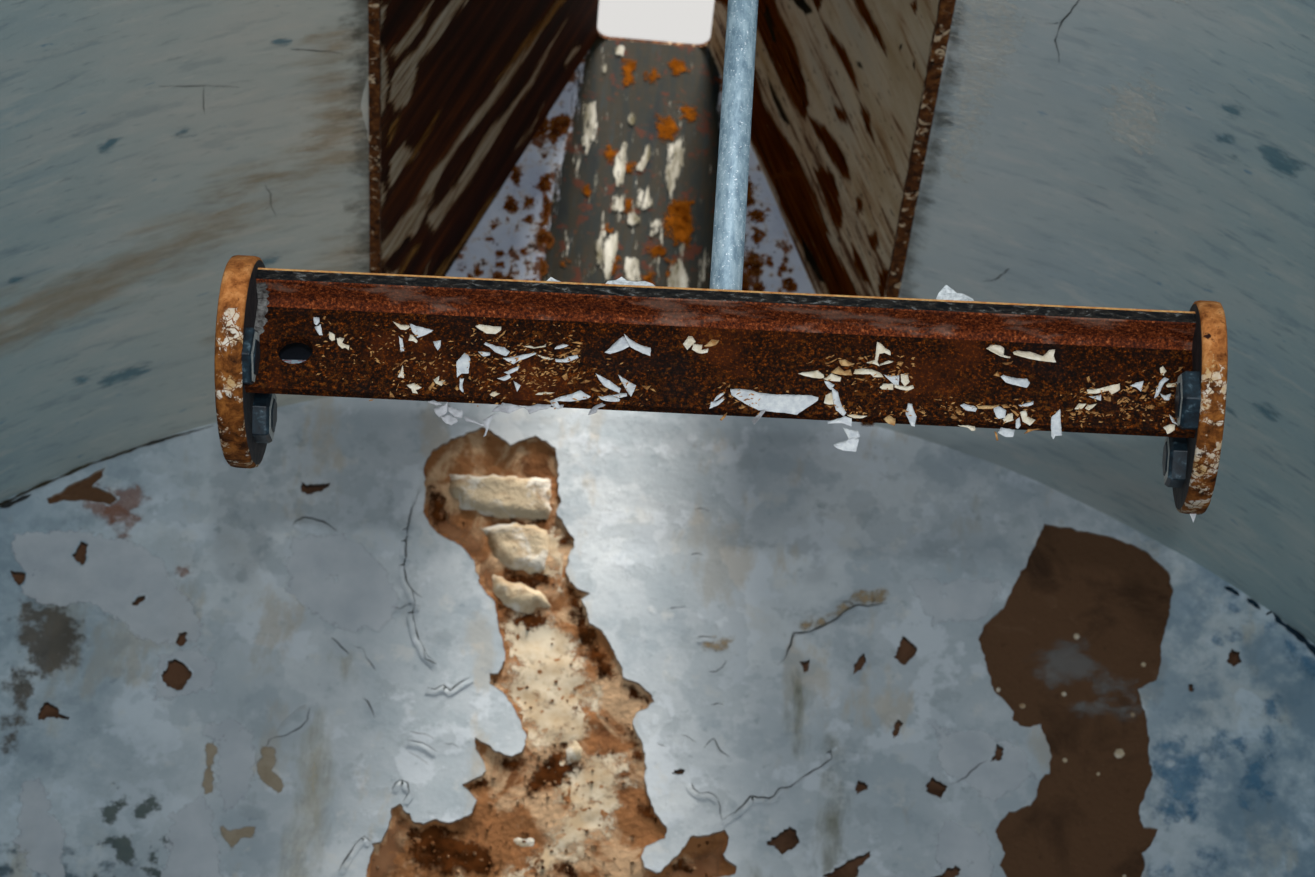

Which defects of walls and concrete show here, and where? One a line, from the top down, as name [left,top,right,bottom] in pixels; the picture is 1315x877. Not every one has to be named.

corrosion [853,0,902,57]
crack [1047,0,1079,53]
peeling [380,0,569,276]
corrosion [742,0,888,297]
corrosion [458,165,571,281]
peeling [596,138,690,288]
flaking render [366,322,736,877]
flaking render [161,632,192,691]
crack [392,731,459,805]
leakage [1153,742,1202,816]
crack [339,836,372,874]
leakage [936,820,997,877]